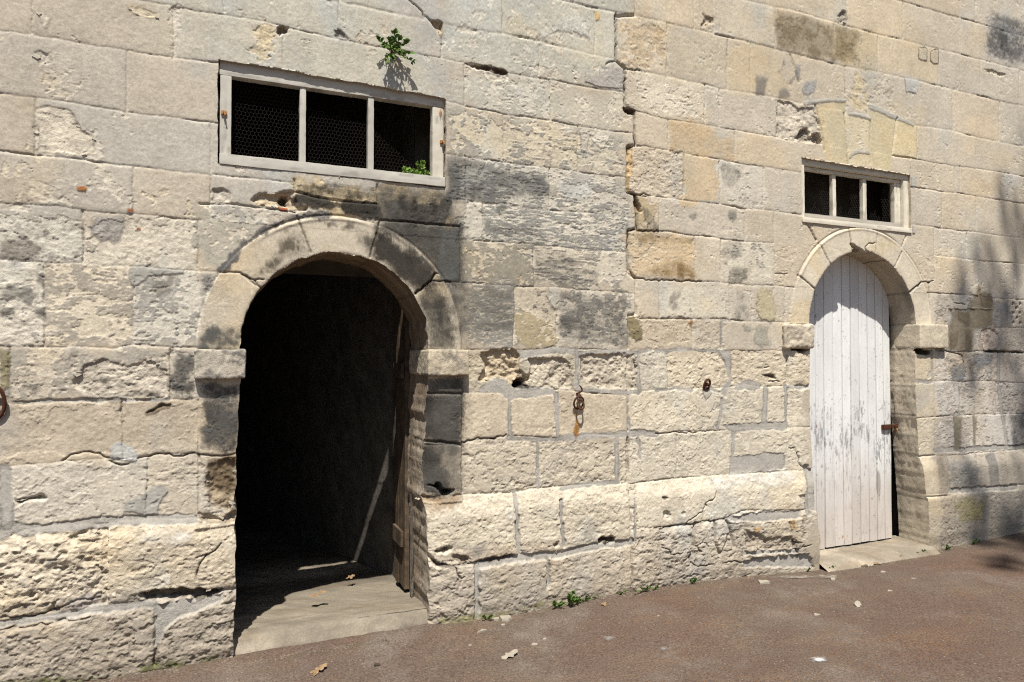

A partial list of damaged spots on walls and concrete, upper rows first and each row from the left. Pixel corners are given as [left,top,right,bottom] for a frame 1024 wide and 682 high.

spalling [776,101,820,145]
spalling [478,348,638,390]
crack [662,494,741,567]